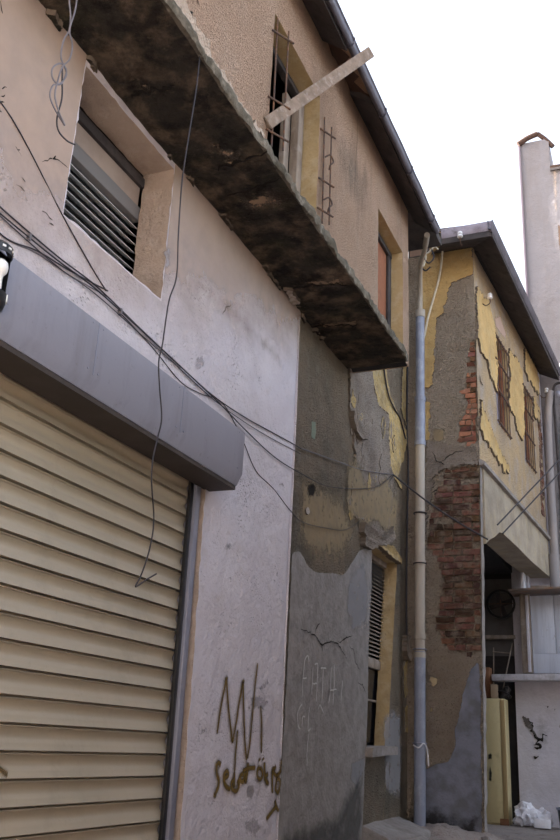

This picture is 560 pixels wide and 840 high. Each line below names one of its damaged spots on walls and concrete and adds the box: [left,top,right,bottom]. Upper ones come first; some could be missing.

spalling [46,8,70,37]
spalling [86,55,98,73]
peeling [174,0,265,138]
damp [242,193,280,209]
spalling [262,265,326,341]
peeling [422,246,473,389]
peeling [347,367,407,550]
spalling [425,286,545,657]
crack [301,623,366,693]
peeling [522,716,547,759]